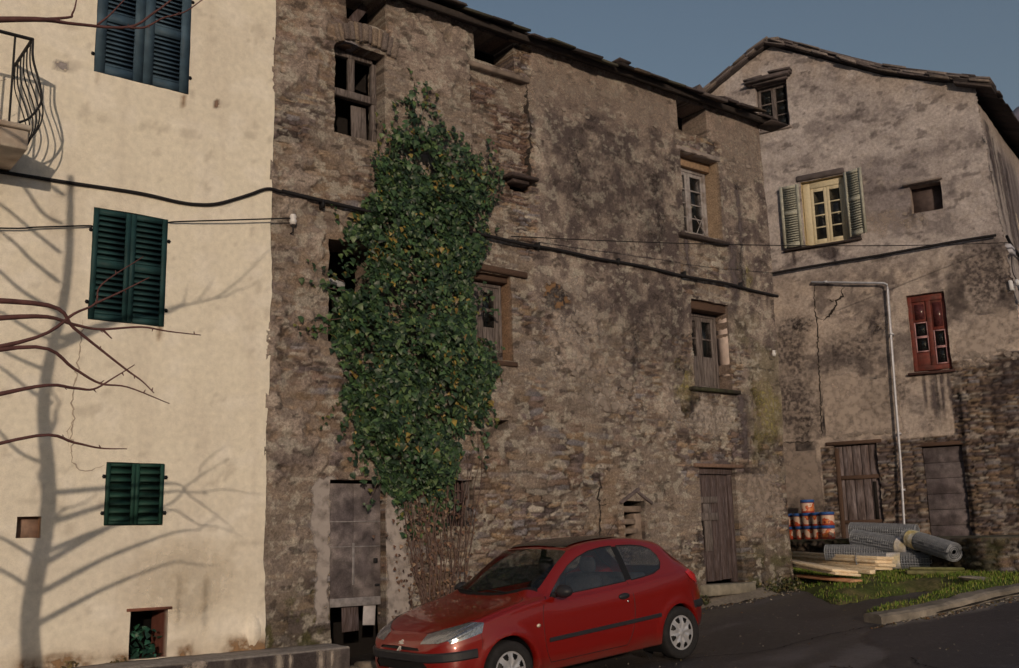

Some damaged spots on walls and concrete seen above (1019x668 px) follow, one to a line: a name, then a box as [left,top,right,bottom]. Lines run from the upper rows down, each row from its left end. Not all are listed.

crack [66,324,104,471]
crack [783,286,844,444]
crack [595,472,606,536]